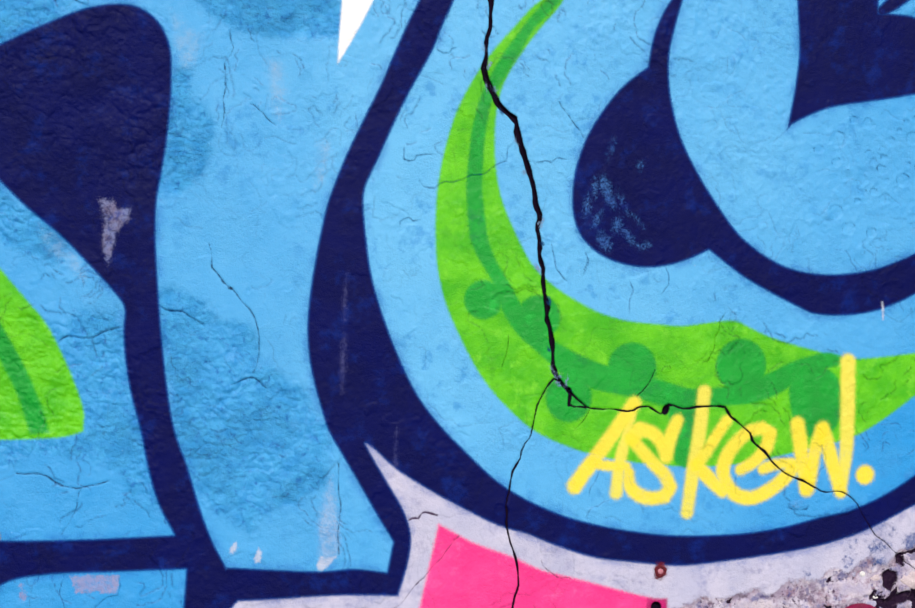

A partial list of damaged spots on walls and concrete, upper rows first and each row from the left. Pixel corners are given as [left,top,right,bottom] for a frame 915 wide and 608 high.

crack [481,0,915,608]
rust [653,560,669,581]
spalling [674,523,915,608]